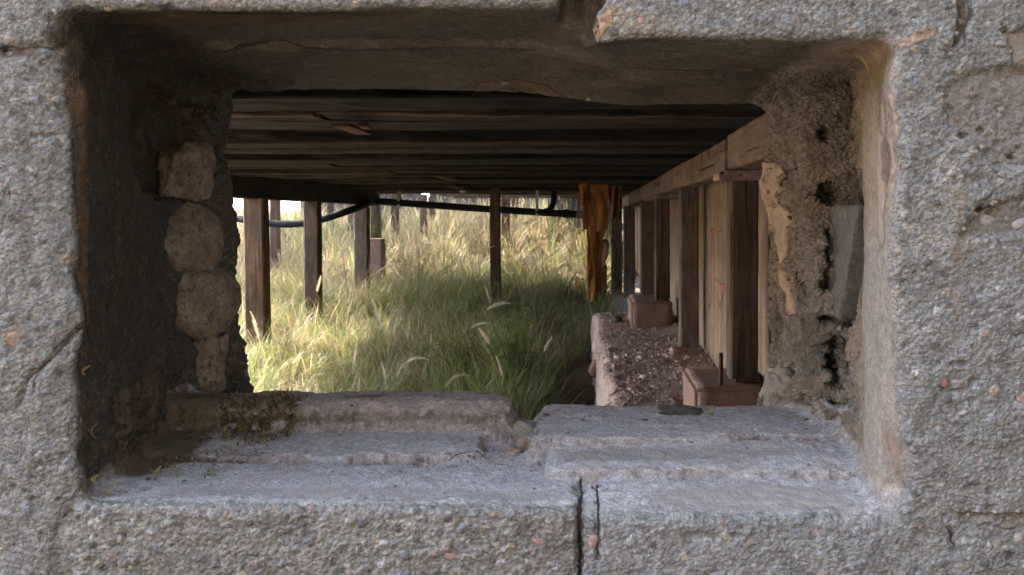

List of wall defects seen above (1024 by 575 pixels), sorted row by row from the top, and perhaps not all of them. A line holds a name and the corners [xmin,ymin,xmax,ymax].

peeling [759,162,797,317]
crack [21,327,84,402]
peeling [813,246,864,391]
crack [577,478,600,575]